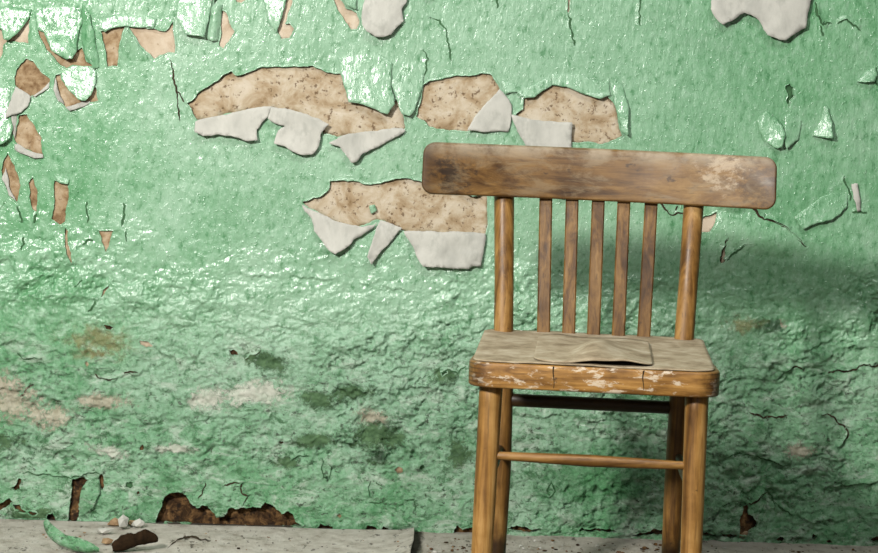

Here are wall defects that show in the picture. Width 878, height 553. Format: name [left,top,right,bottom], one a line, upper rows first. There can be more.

peeling [263,0,296,41]
peeling [331,0,407,37]
peeling [711,0,811,40]
peeling [0,0,237,214]
peeling [185,54,629,163]
peeling [49,176,75,267]
peeling [300,176,490,269]
crack [661,204,683,216]
crack [784,360,878,373]
crack [749,408,788,419]
crack [819,410,849,445]
spalling [153,478,343,529]